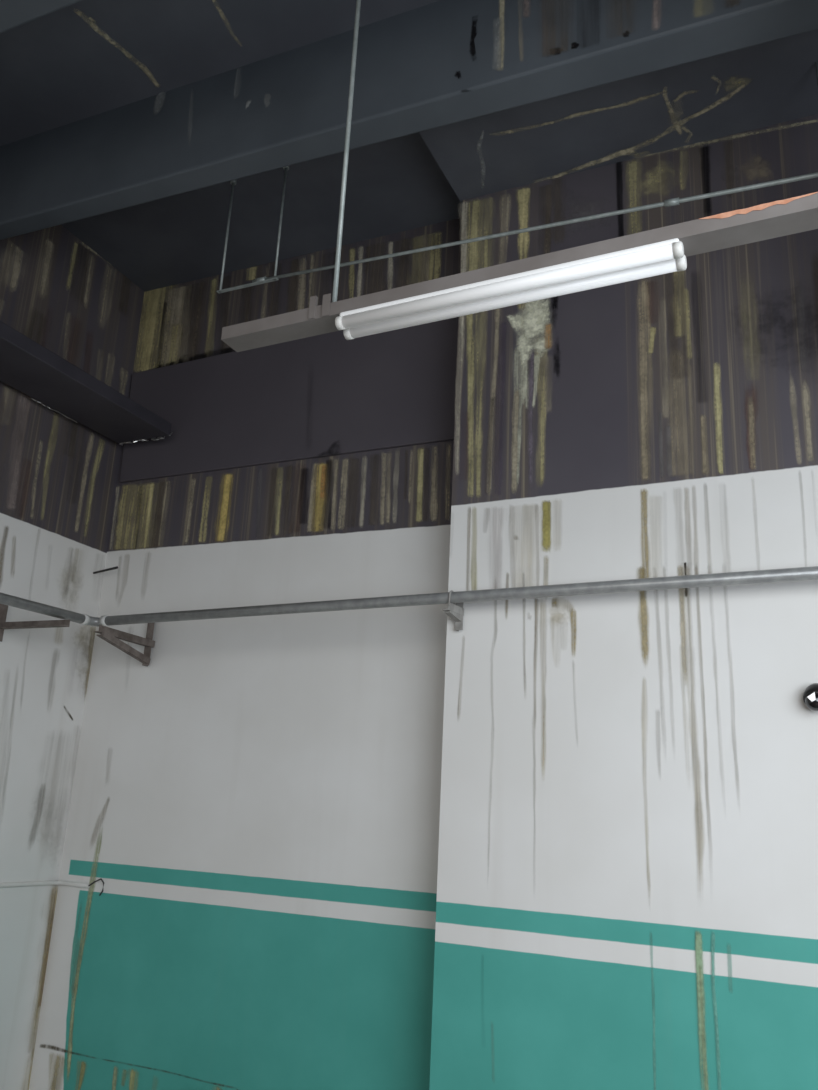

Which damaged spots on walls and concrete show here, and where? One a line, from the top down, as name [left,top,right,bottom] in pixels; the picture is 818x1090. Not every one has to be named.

crack [76,11,164,112]
crack [477,85,769,186]
water stain [461,200,488,273]
water stain [502,188,530,259]
water stain [449,300,550,495]
water stain [0,527,8,581]
water stain [361,454,390,524]
water stain [409,447,449,521]
water stain [543,501,551,550]